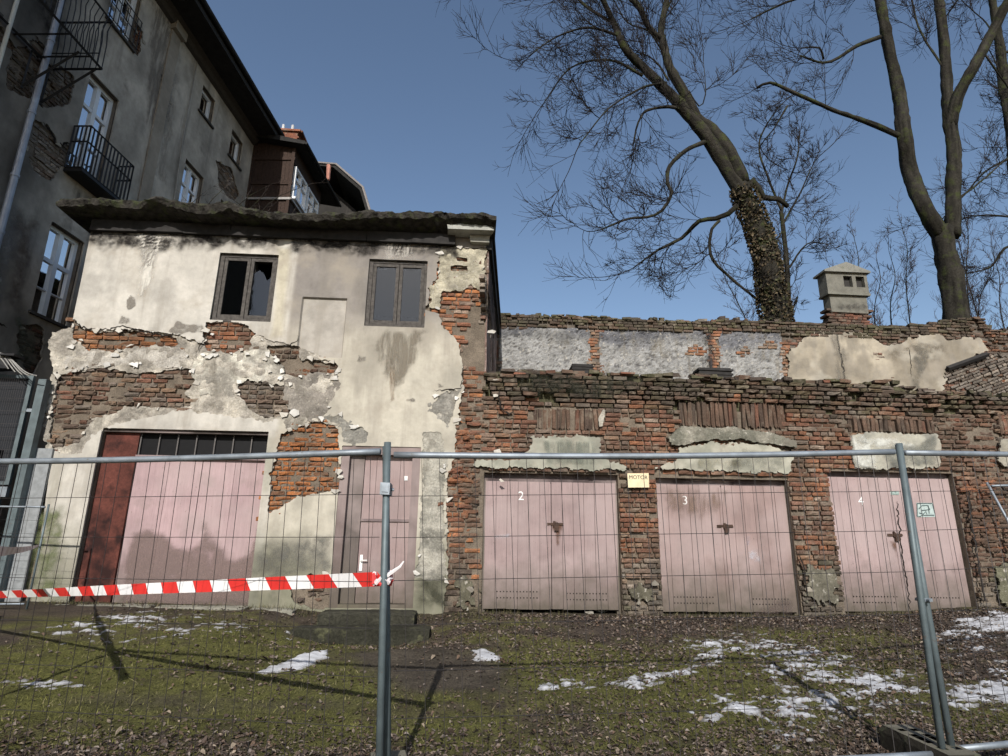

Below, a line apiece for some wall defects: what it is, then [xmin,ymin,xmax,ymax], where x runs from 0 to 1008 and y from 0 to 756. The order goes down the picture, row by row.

spalling [0,28,73,108]
spalling [26,121,73,180]
spalling [216,161,238,201]
flaking render [424,245,496,352]
damp [377,332,420,385]
flaking render [16,297,368,521]
spalling [413,366,498,611]
spalling [296,588,330,602]
crack [896,503,911,607]